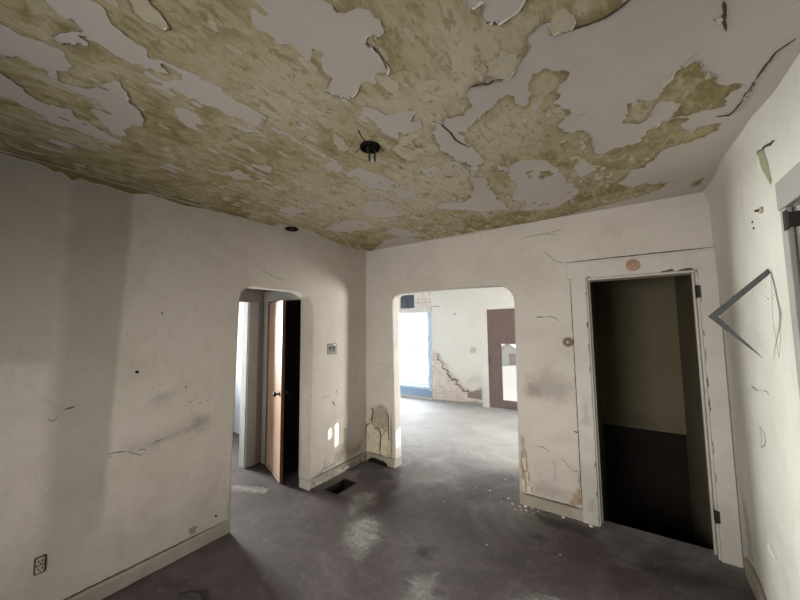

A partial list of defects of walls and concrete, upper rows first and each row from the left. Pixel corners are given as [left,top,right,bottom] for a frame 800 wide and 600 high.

crack [716,39,795,117]
peeling [0,0,742,251]
crack [432,121,469,147]
peeling [756,140,774,185]
flaking render [327,403,391,475]